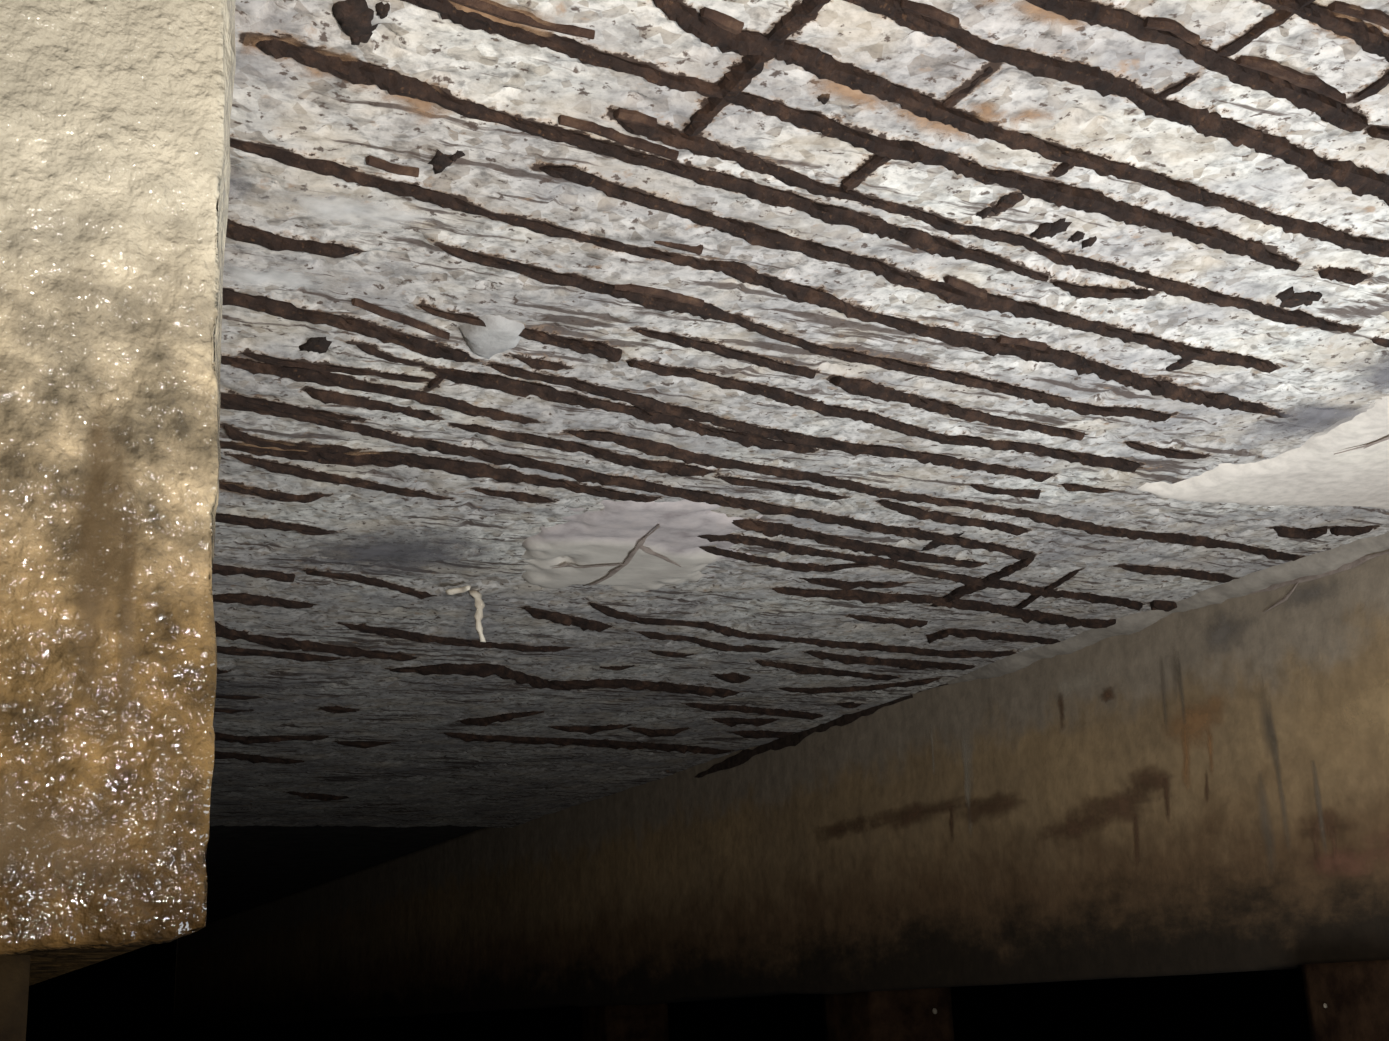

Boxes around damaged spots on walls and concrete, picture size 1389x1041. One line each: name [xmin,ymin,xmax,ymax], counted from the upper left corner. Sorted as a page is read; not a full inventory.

corrosion [457,5,545,34]
corrosion [1022,3,1084,25]
corrosion [393,95,446,115]
corrosion [823,80,878,106]
corrosion [899,110,966,136]
corrosion [974,105,1044,120]
spalling [209,0,1389,828]